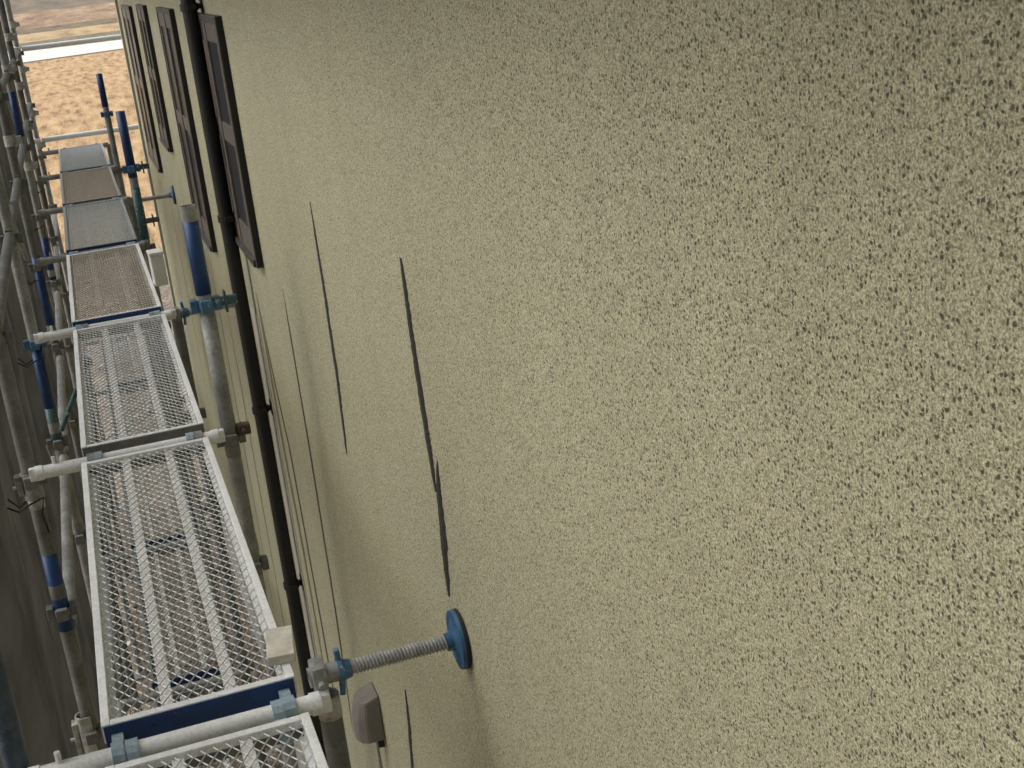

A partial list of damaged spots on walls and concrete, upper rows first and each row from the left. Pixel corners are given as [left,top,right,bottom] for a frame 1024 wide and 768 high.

crack [207,247,284,625]
crack [256,288,353,729]
crack [310,203,347,454]
crack [399,257,450,597]
crack [404,689,414,768]